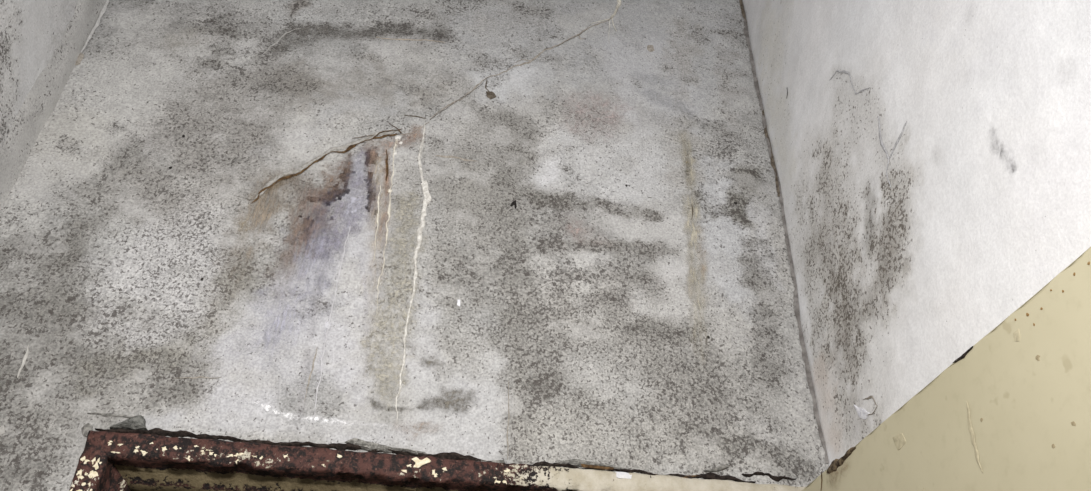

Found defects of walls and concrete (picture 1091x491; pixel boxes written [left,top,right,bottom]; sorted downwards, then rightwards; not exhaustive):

crack [432,10,618,117]
rust [371,134,417,223]
water stain [261,176,367,429]
water stain [362,122,432,423]
water stain [436,390,470,411]